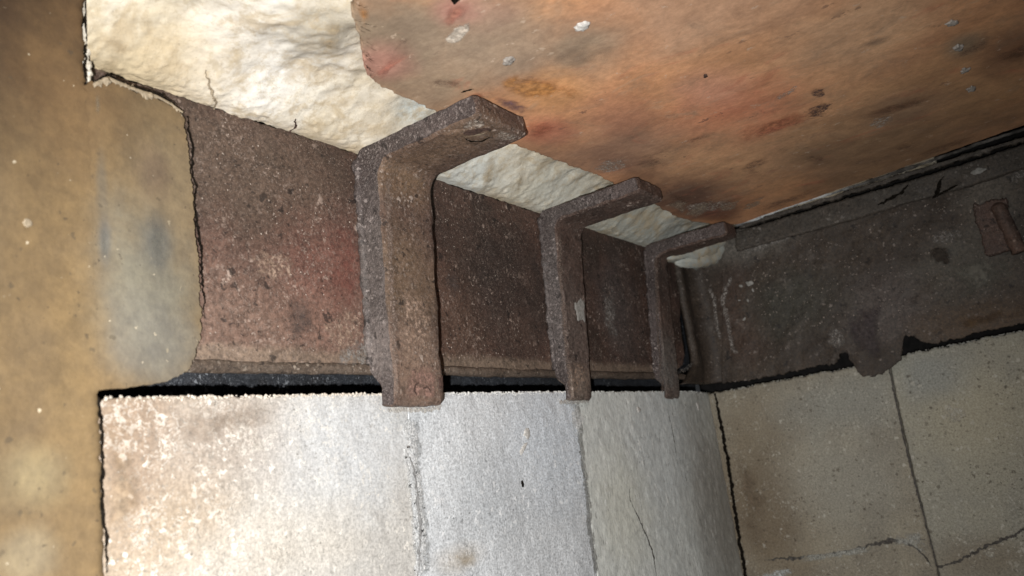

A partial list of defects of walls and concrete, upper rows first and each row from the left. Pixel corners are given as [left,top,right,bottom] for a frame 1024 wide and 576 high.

crack [83,0,205,318]
crack [878,185,908,205]
crack [932,176,958,199]
crack [767,369,1024,576]